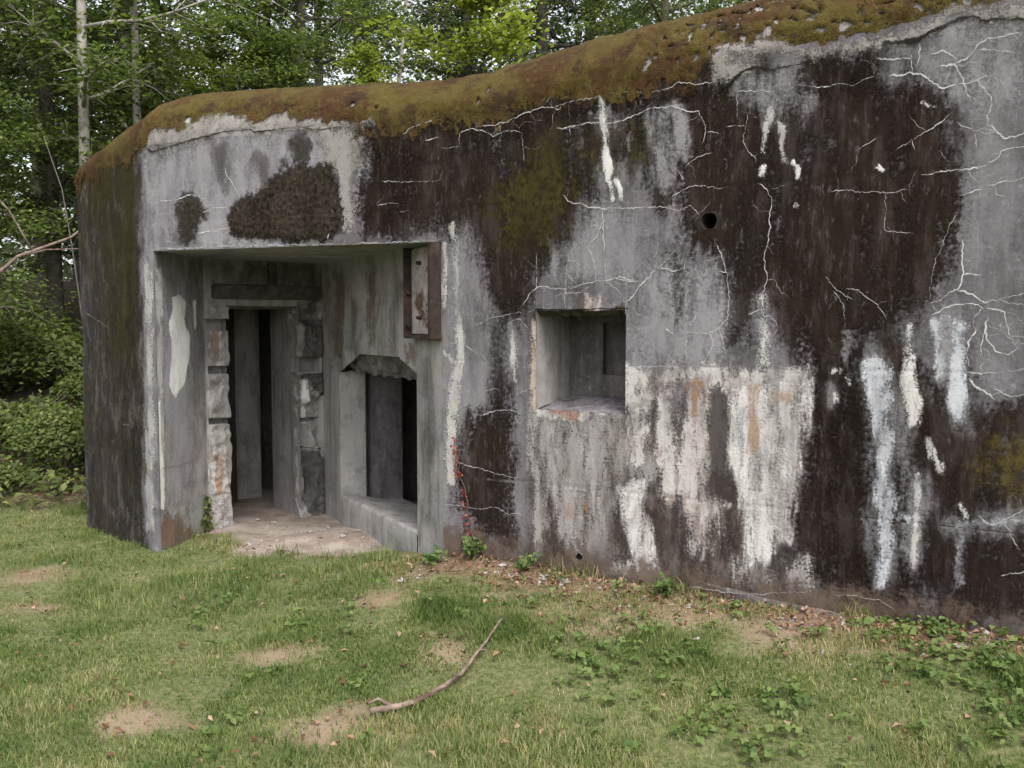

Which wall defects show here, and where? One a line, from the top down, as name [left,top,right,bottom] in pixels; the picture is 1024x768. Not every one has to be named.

damp [78,130,340,551]
damp [350,38,1024,630]
crack [404,15,1024,400]
rust [746,386,759,451]
crack [980,509,1024,547]